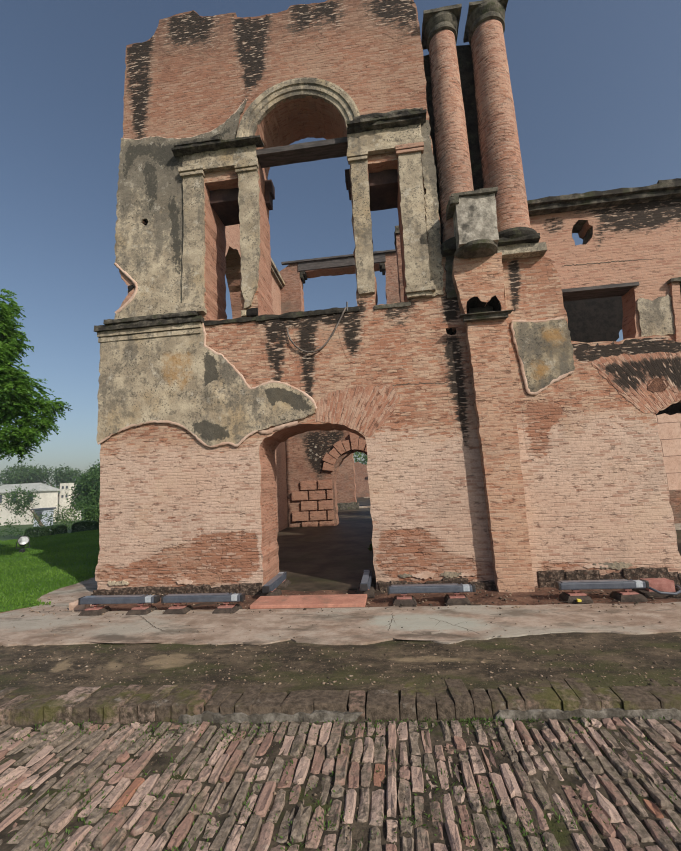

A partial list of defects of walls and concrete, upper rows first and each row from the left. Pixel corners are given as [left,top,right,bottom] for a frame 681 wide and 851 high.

leakage [124,0,420,139]
peeling [114,98,247,319]
peeling [421,120,458,298]
leakage [540,198,681,251]
peeling [96,323,317,448]
spalling [241,308,258,317]
leakage [249,295,424,400]
leakage [437,291,473,451]
spalling [466,296,501,314]
leakage [505,258,523,316]
peeling [510,317,575,395]
leakage [571,337,681,396]